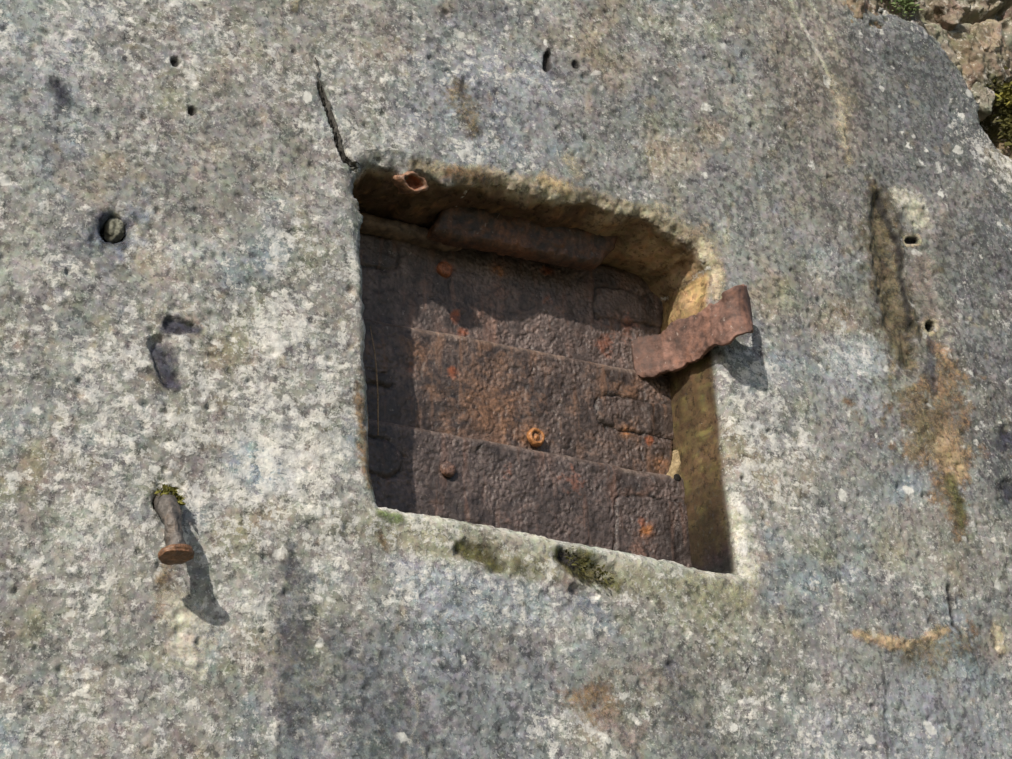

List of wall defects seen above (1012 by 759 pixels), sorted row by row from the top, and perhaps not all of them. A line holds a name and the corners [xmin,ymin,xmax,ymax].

crack [315,57,361,168]
rust [353,383,372,488]
rust [377,509,403,523]